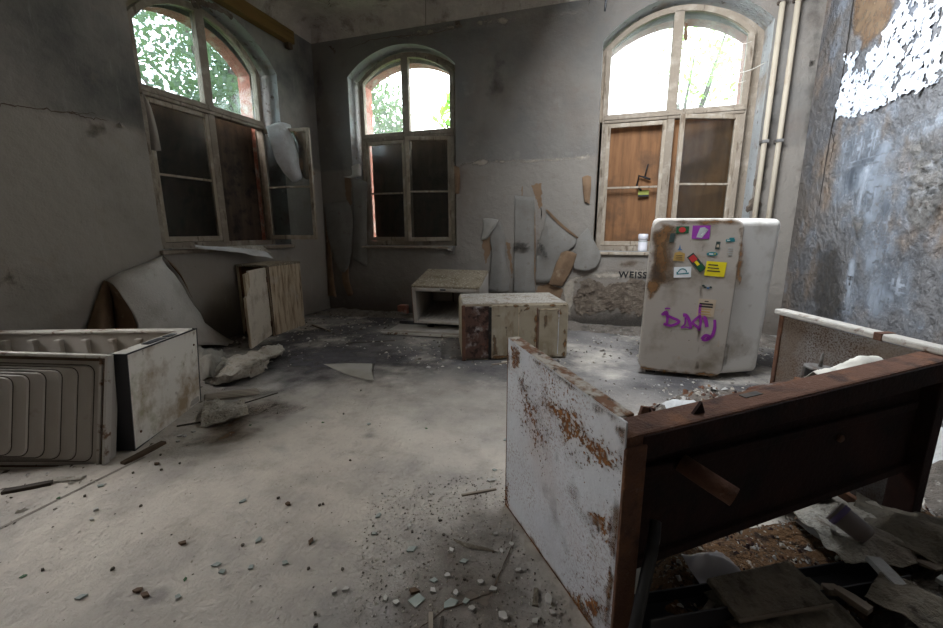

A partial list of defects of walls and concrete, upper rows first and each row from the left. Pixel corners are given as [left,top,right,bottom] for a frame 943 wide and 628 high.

peeling [835,0,943,119]